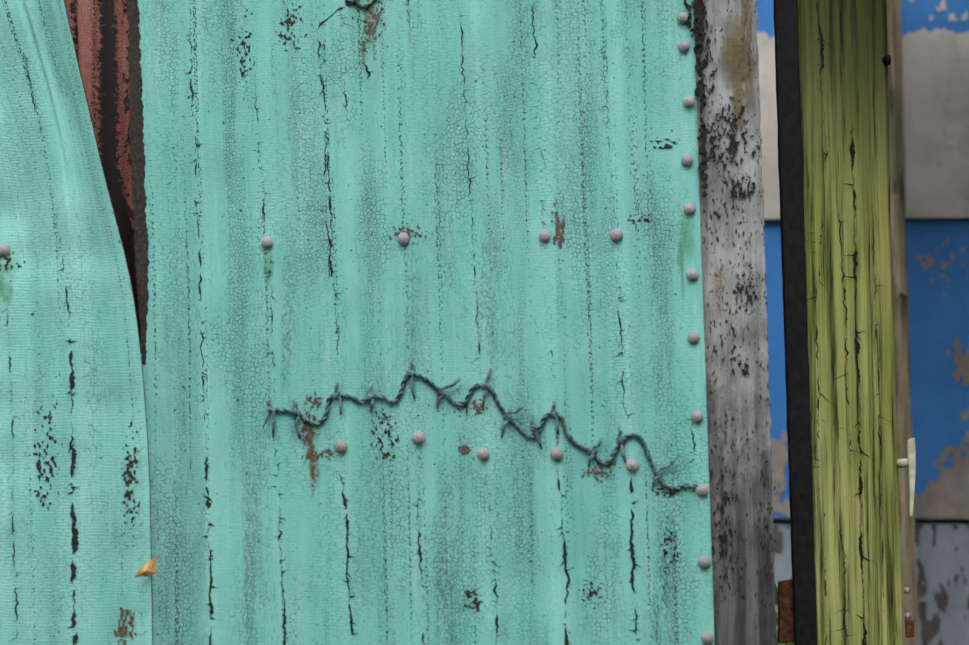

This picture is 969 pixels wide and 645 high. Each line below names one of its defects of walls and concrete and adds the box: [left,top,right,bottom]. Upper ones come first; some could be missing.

peeling [702,12,780,219]
peeling [902,0,969,218]
peeling [916,237,969,283]
peeling [946,338,969,387]
peeling [914,432,969,546]
peeling [917,557,966,645]